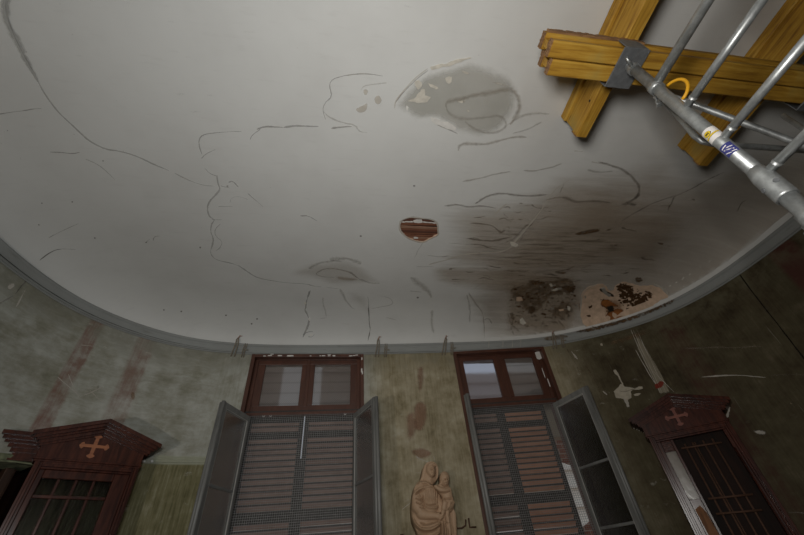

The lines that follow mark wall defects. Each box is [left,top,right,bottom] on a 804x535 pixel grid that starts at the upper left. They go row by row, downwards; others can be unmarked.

crack [2,0,336,289]
spalling [399,217,439,258]
water stain [502,256,578,348]
flaking render [579,278,670,327]
water stain [577,300,673,332]
flaking render [603,370,643,407]